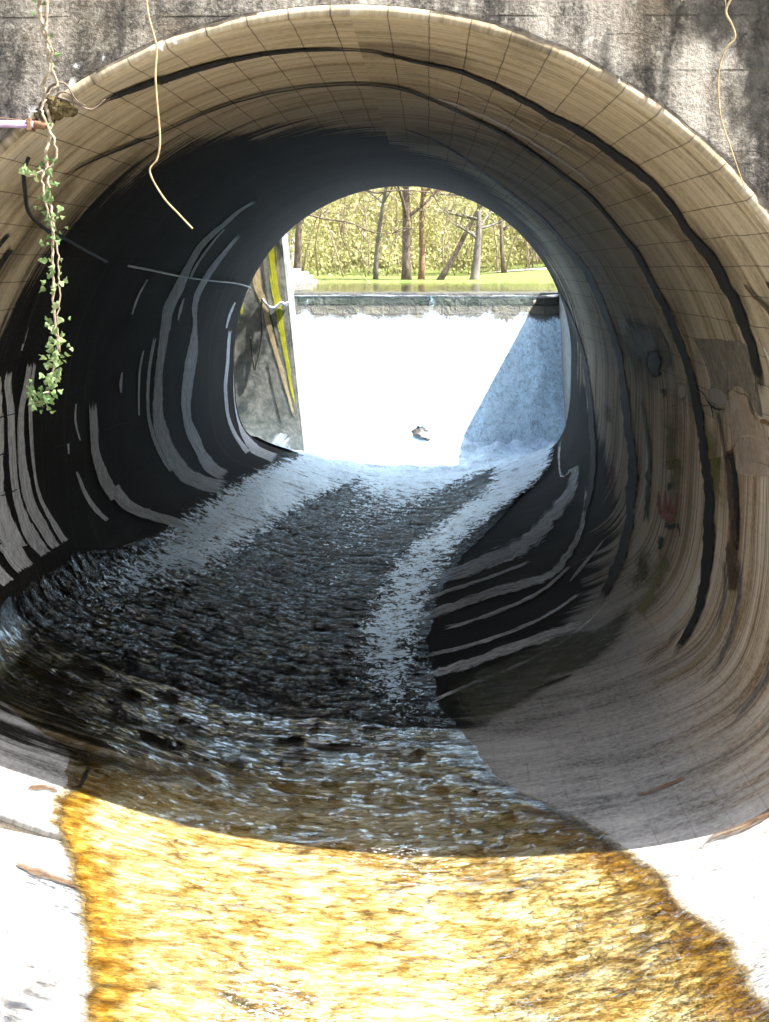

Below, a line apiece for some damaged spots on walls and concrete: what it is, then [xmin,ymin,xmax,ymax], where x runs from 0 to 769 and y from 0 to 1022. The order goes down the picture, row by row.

leakage [715,0,733,51]
peeling [695,339,769,476]